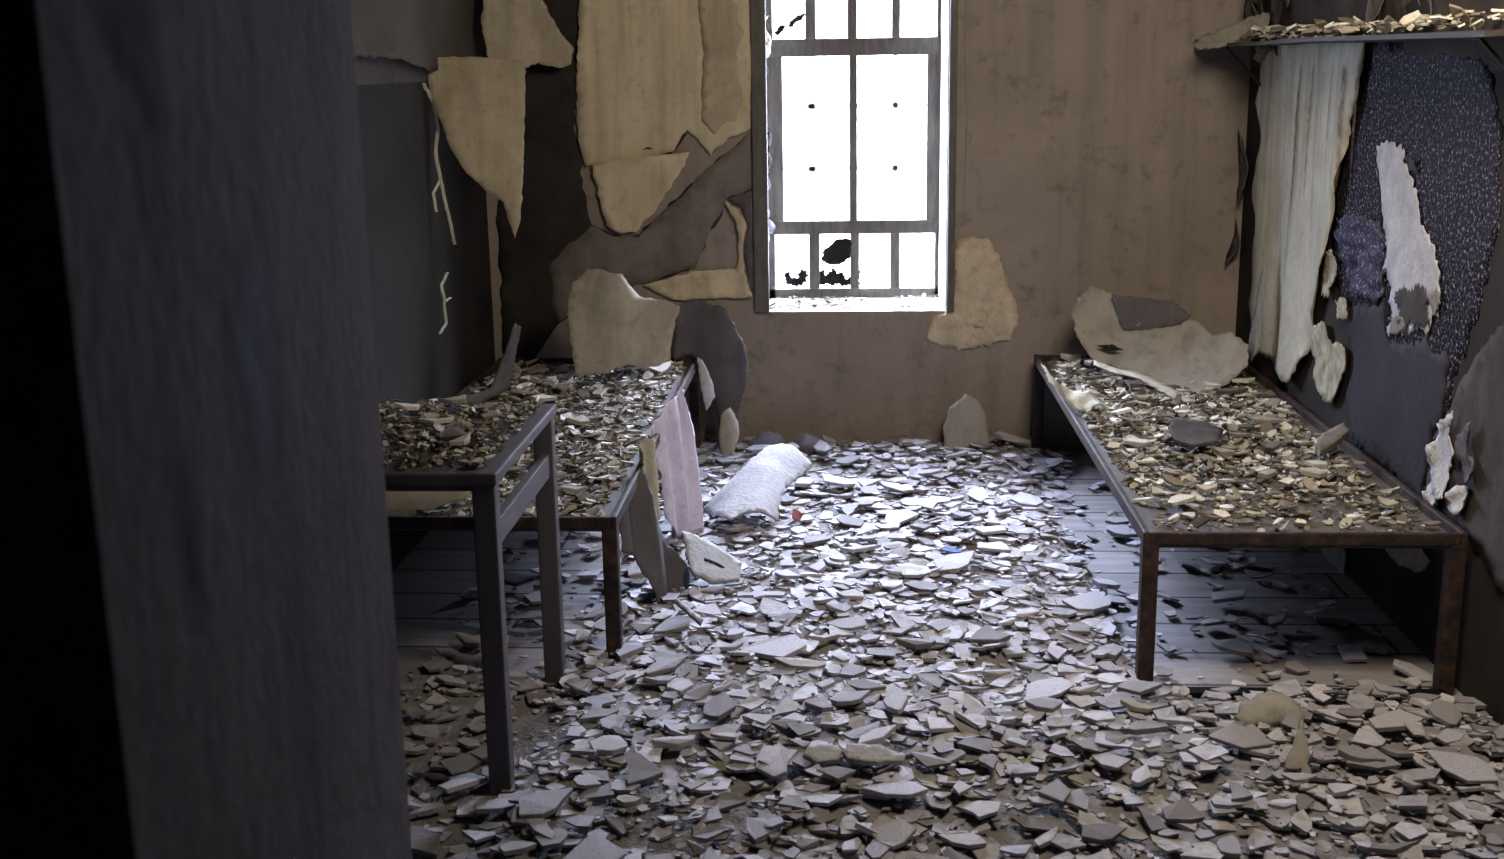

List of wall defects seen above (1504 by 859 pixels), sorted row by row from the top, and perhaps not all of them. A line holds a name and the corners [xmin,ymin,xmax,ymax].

peeling [350,0,775,358]
peeling [1225,0,1441,403]